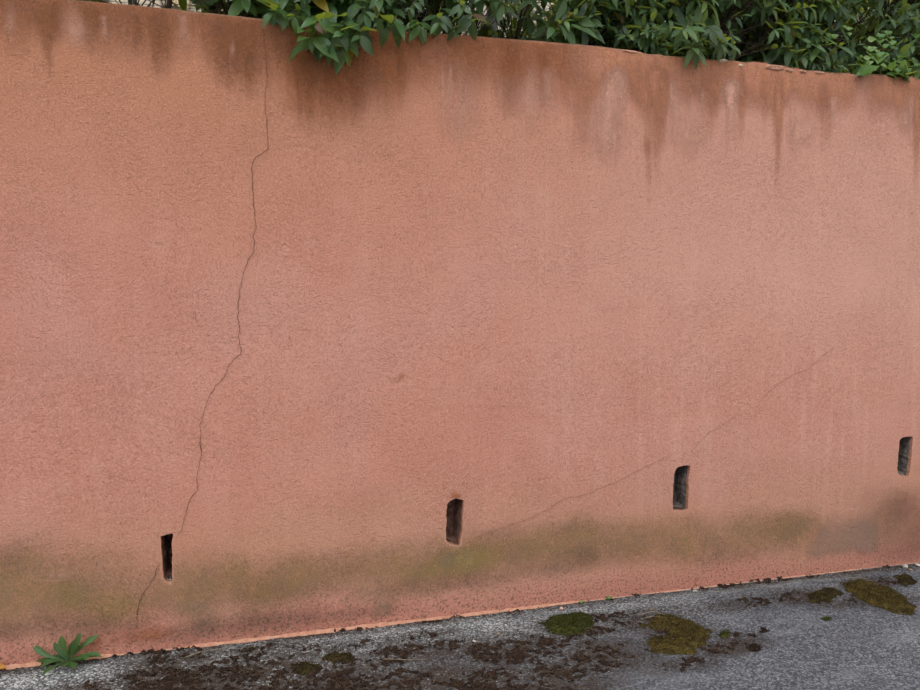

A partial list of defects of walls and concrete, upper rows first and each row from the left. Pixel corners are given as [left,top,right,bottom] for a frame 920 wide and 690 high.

water stain [9,0,272,71]
water stain [287,24,429,105]
water stain [443,35,857,151]
water stain [871,75,920,145]
crack [181,29,276,531]